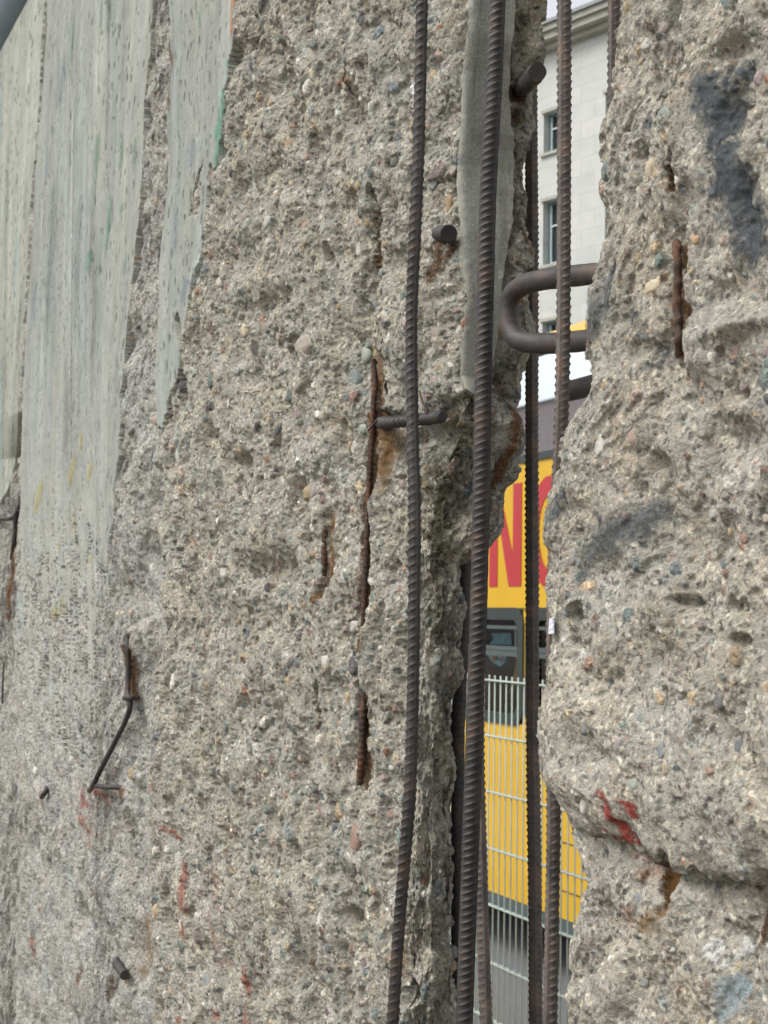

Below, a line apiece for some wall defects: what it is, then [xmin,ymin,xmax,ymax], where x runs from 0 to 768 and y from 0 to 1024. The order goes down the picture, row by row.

water stain [723,59,758,85]
water stain [705,124,768,273]
rust [423,240,457,283]
rust [659,273,693,328]
rust [366,354,403,491]
spalling [0,0,572,1024]
rust [5,551,15,620]
rust [309,512,335,606]
spalling [565,597,587,626]
rust [121,643,143,702]
rust [354,693,372,793]
rust [641,860,681,931]